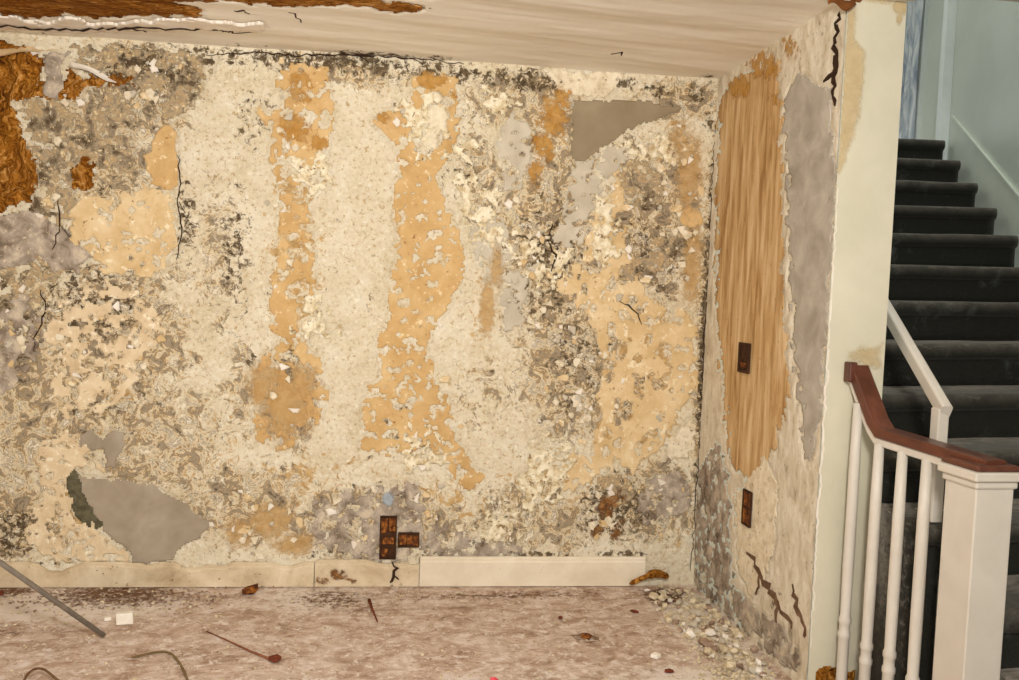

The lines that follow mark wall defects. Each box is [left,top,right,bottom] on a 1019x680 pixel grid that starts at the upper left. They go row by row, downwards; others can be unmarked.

spalling [0,0,422,568]
peeling [310,71,532,563]
water stain [616,78,673,98]
peeling [544,59,838,672]
water stain [688,81,714,132]
crack [690,124,716,569]
crack [746,552,807,638]